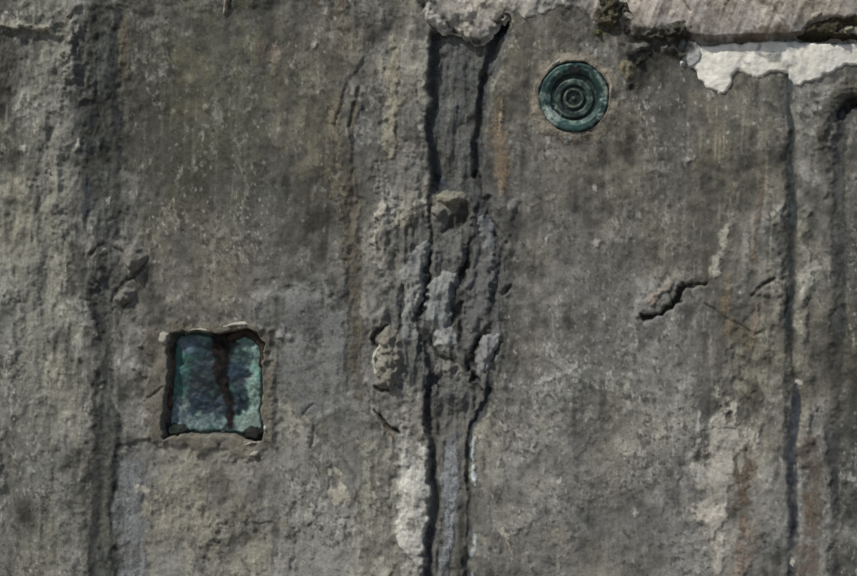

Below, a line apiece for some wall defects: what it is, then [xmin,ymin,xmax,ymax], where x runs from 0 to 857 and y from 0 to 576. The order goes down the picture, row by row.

peeling [0,11,79,80]
water stain [477,21,510,116]
water stain [416,33,442,425]
water stain [783,74,797,356]
water stain [831,102,853,346]
water stain [451,134,501,492]
crack [637,284,690,321]
crack [374,410,400,441]
water stain [775,379,801,576]
water stain [425,526,436,576]
water stain [459,503,477,564]